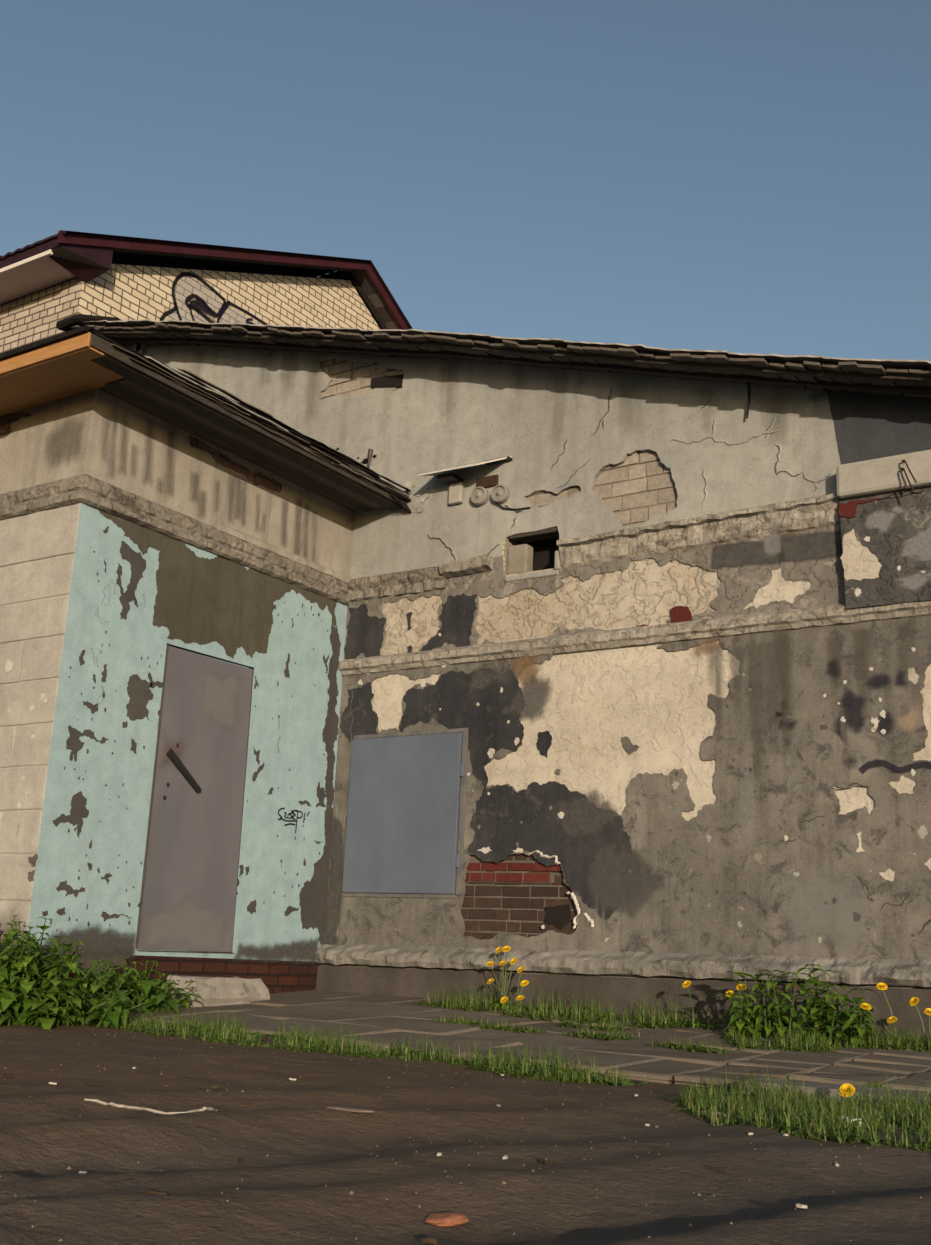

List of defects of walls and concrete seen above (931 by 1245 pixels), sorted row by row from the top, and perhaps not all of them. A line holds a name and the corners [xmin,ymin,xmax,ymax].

flaking render [321,356,404,401]
crack [550,387,614,490]
flaking render [526,451,678,528]
crack [670,415,831,507]
peeling [744,567,811,609]
peeling [838,490,922,596]
peeling [897,524,931,590]
peeling [42,510,741,946]
peeling [871,697,886,734]
peeling [889,664,931,794]
peeling [833,786,875,815]
peeling [879,868,895,881]